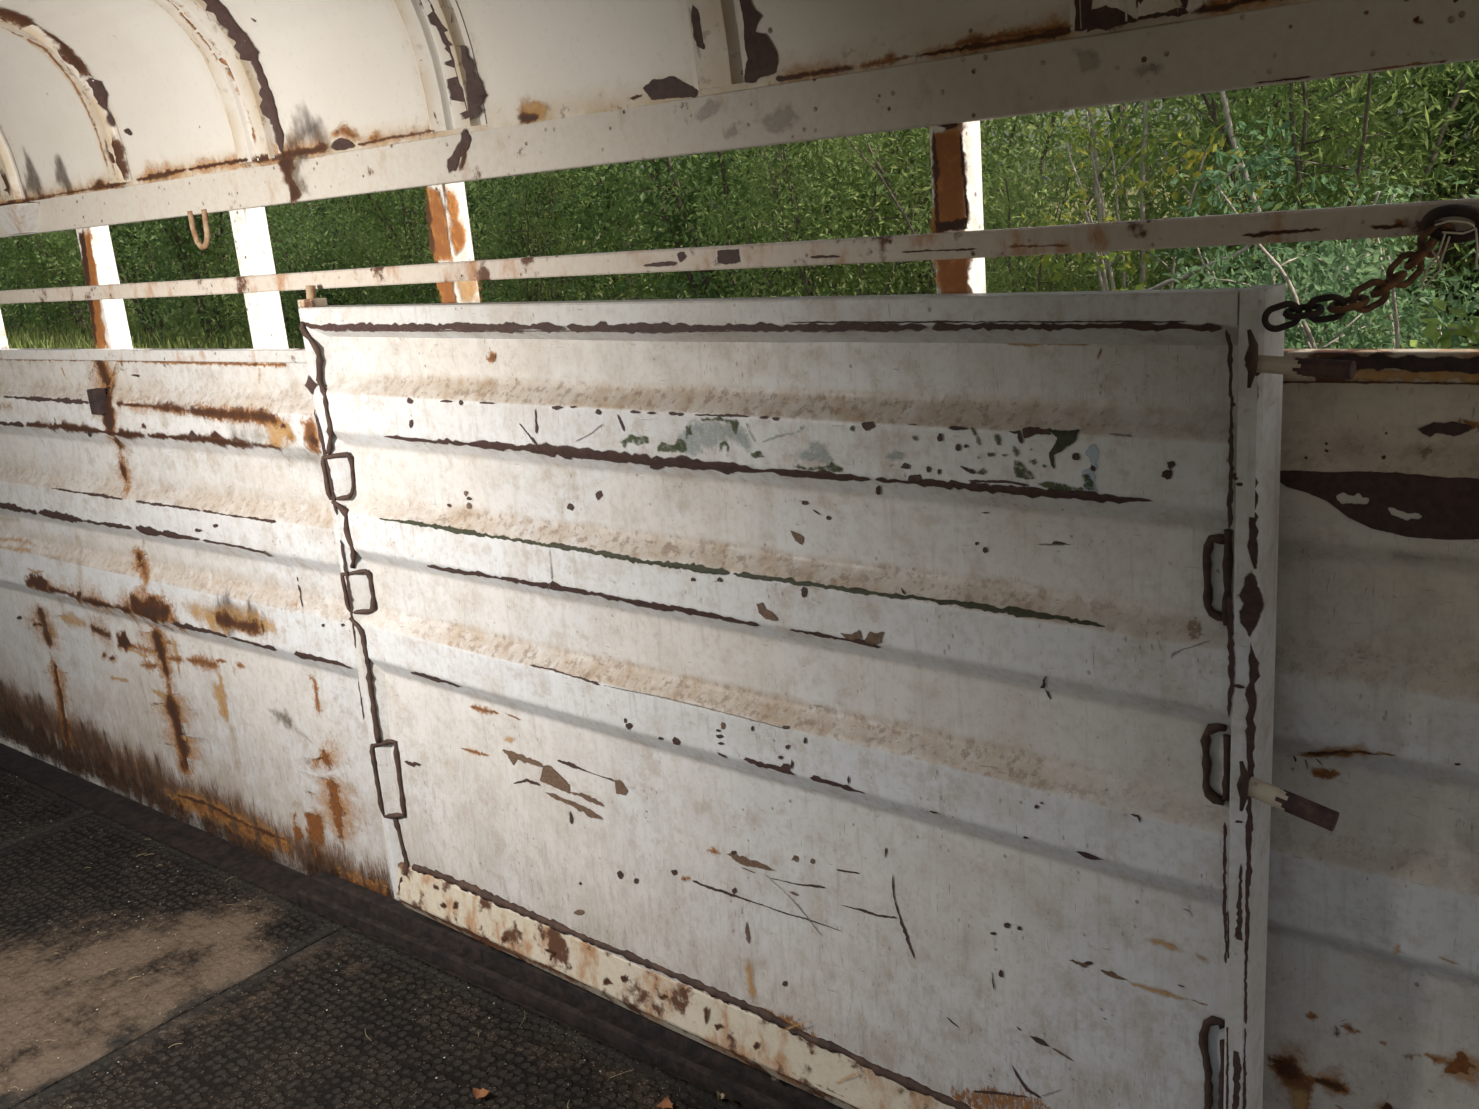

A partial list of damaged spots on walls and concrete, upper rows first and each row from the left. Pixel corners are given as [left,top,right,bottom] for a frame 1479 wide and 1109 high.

rust [0,118,434,206]
peeling [168,0,283,153]
peeling [420,0,488,173]
rust [518,101,547,124]
rust [784,20,1071,80]
rust [903,123,975,294]
peeling [384,397,1151,504]
peeling [1280,470,1479,540]
rust [0,547,626,998]
peeling [502,738,627,824]
peeling [1222,329,1264,1109]
rust [1268,1056,1350,1109]